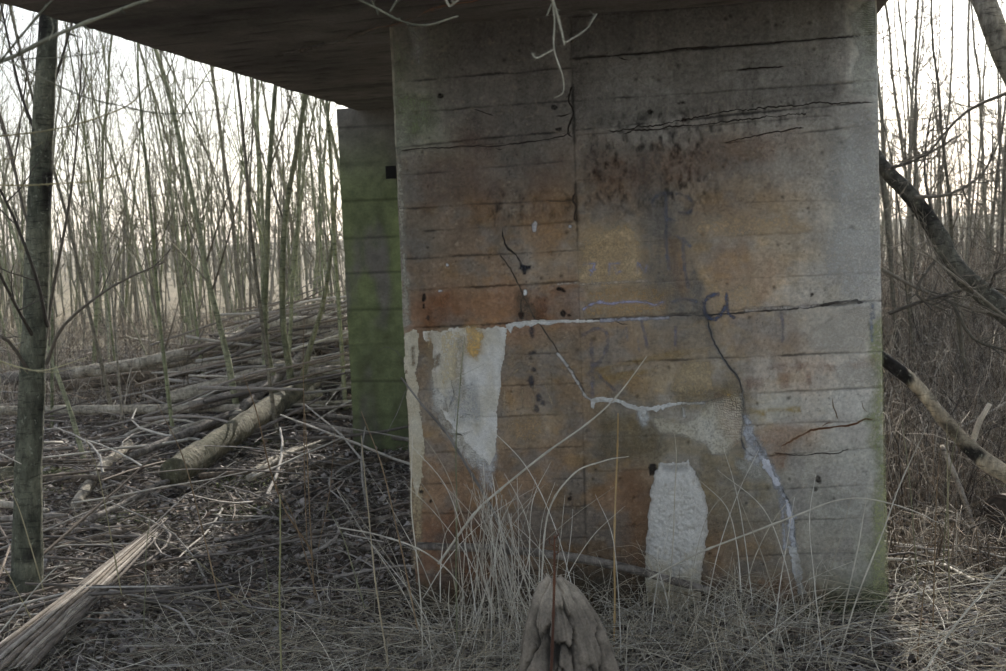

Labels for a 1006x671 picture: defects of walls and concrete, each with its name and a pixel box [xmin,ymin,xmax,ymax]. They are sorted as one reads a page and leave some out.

crack [402,87,574,151]
crack [577,36,853,71]
crack [607,101,871,143]
damp [398,164,682,566]
crack [500,230,585,393]
damp [556,353,807,594]
crack [586,299,872,546]